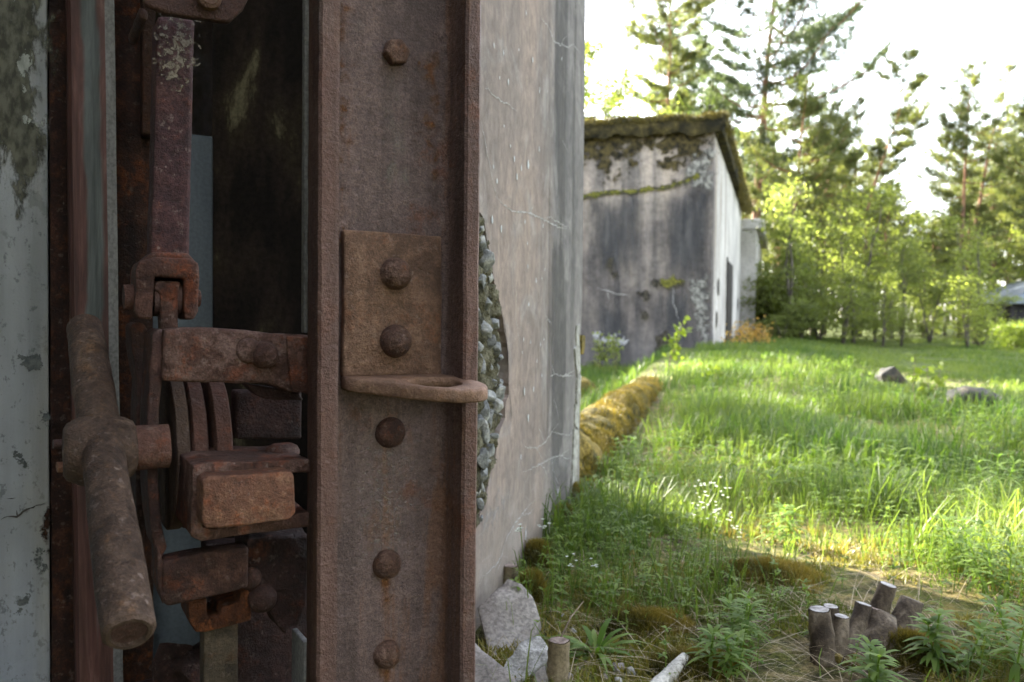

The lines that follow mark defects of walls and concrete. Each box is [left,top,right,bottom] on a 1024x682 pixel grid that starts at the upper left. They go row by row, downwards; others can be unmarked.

peeling [17,49,32,94]
water stain [671,195,706,269]
water stain [659,294,687,348]
spalling [476,215,512,528]
crack [2,498,44,519]